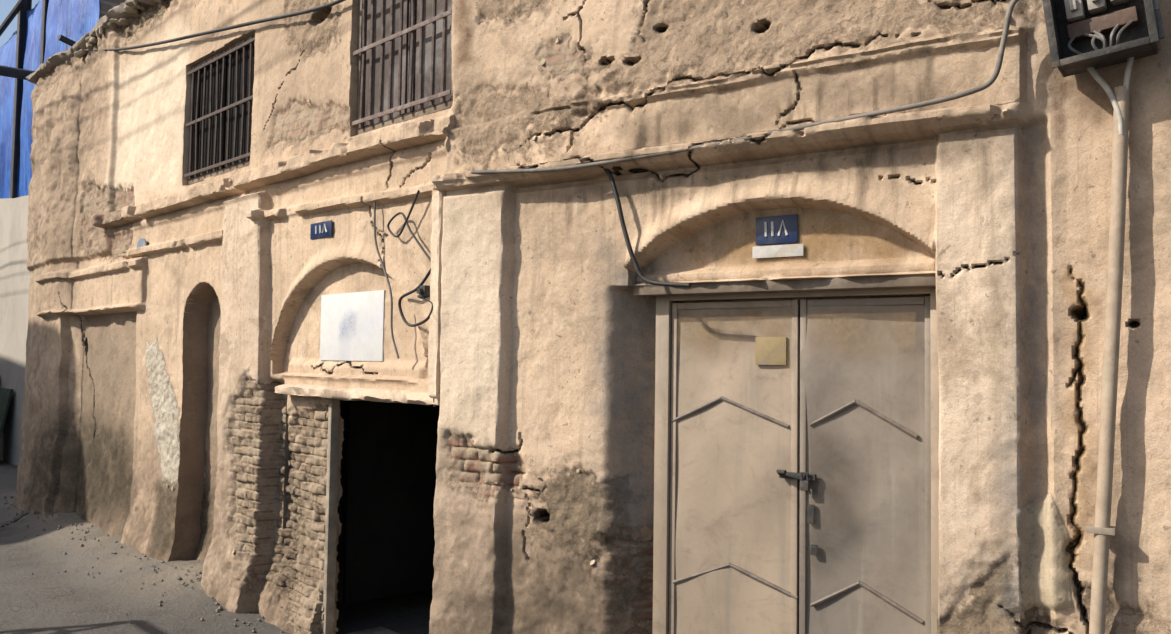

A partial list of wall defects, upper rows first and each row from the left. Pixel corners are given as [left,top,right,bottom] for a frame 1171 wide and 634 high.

crack [935,0,1004,9]
crack [496,34,920,182]
spalling [447,0,1045,171]
crack [940,253,1019,277]
water stain [29,420,130,518]
peeling [146,338,181,491]
spalling [0,376,329,634]
spalling [446,434,654,634]
crack [1001,268,1089,634]